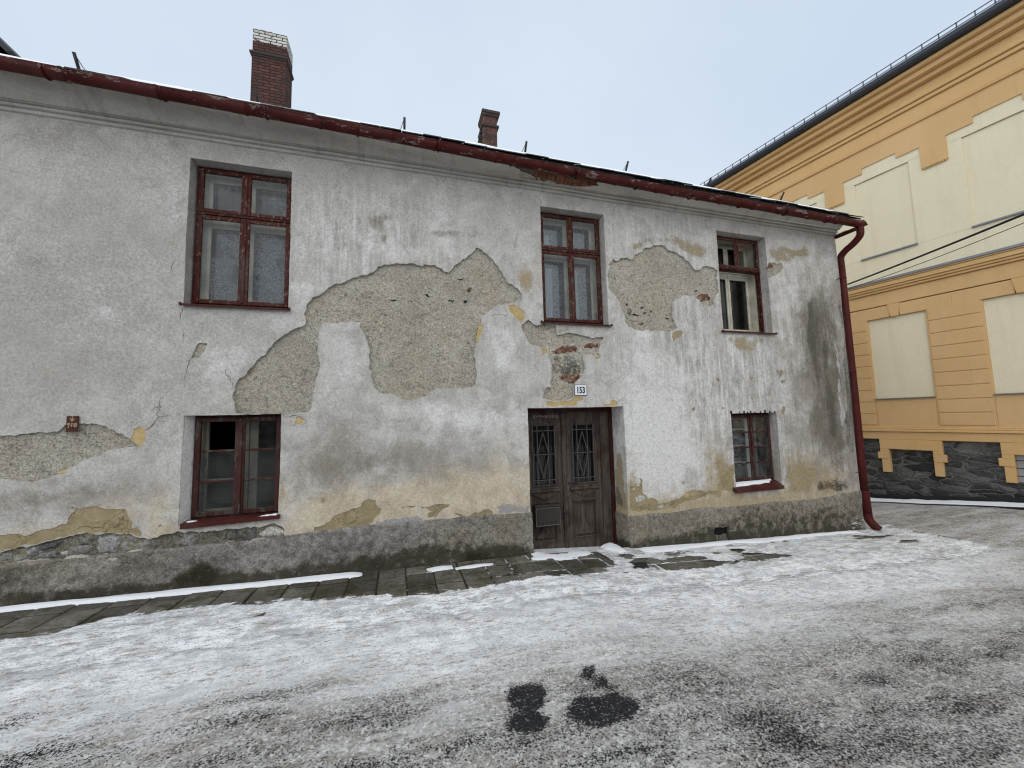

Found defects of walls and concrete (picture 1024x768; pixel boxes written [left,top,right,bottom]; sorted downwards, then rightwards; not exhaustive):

spalling [607,245,717,341]
spalling [233,248,602,425]
water stain [807,298,852,464]
spalling [0,423,146,482]
spalling [0,506,284,563]
peeling [314,499,493,531]
peeling [630,478,721,512]
water stain [783,462,847,491]